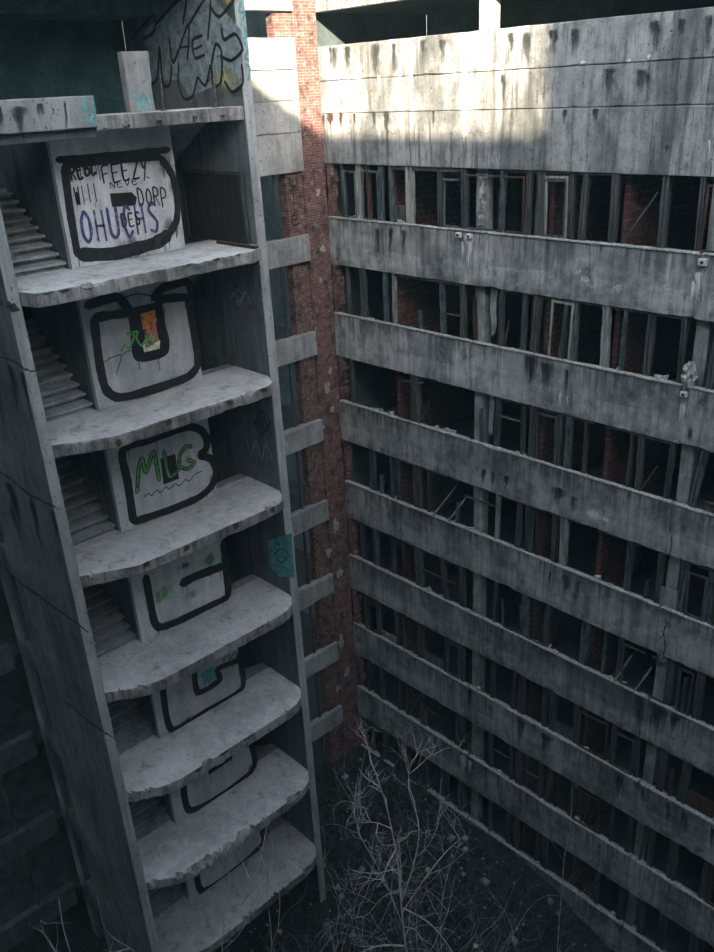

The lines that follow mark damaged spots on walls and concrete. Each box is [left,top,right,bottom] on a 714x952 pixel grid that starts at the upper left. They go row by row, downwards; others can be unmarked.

damp [330,46,350,68]
damp [372,44,380,90]
damp [392,43,413,89]
damp [508,32,530,64]
damp [604,68,616,87]
damp [626,58,649,88]
damp [647,20,660,59]
damp [0,104,43,133]
damp [525,356,553,385]
damp [679,403,693,438]